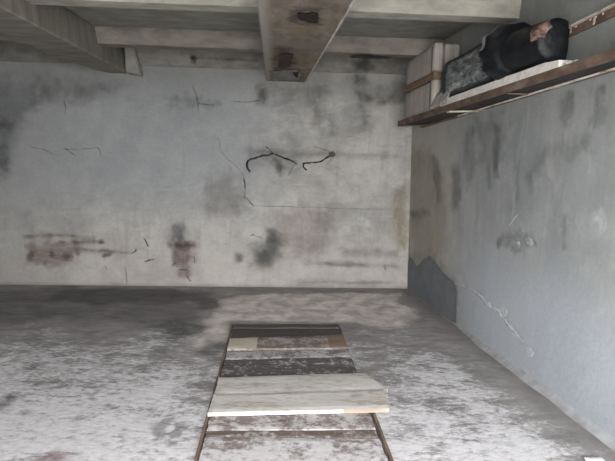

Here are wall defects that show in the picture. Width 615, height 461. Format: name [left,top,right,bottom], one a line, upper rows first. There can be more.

spalling [271,0,356,82]
crack [216,137,335,205]
crack [455,282,534,357]